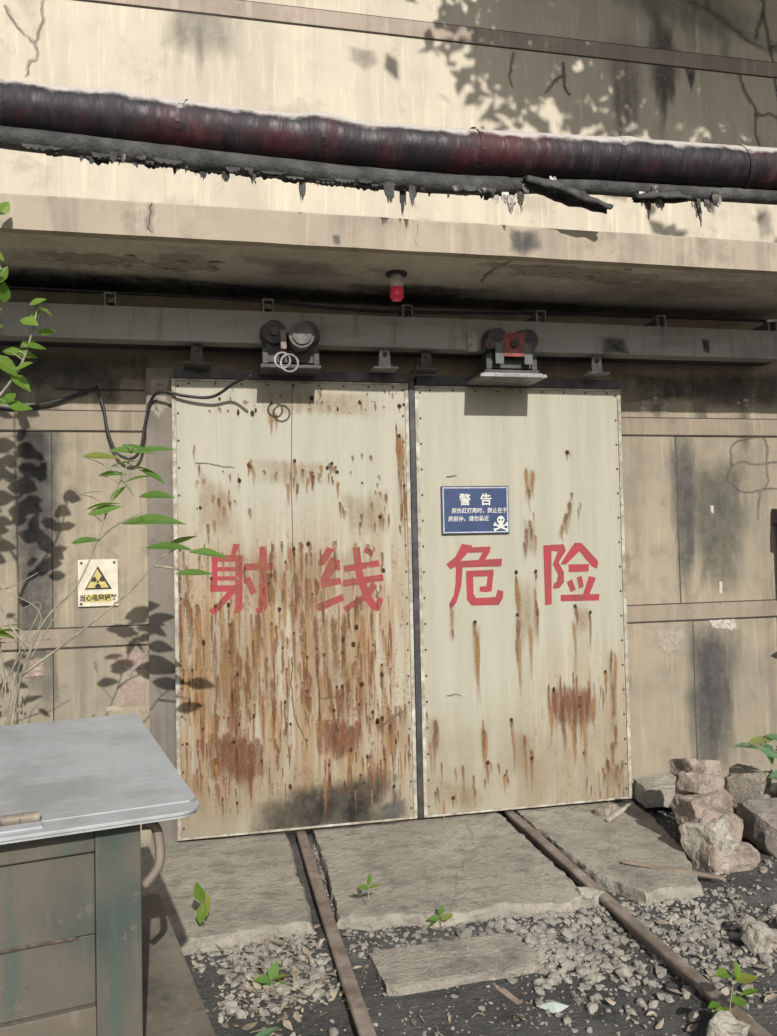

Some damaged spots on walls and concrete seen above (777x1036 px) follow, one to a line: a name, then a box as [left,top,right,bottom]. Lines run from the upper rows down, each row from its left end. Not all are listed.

crack [4,1,43,74]
crack [545,62,570,95]
damp [656,65,694,88]
crack [688,0,777,146]
damp [16,431,55,629]
corrosion [286,459,352,513]
corrosion [359,426,407,549]
crack [727,437,777,519]
corrosion [178,470,410,808]
corrosion [515,569,539,683]
corrosion [426,713,509,794]
corrosion [548,651,624,798]